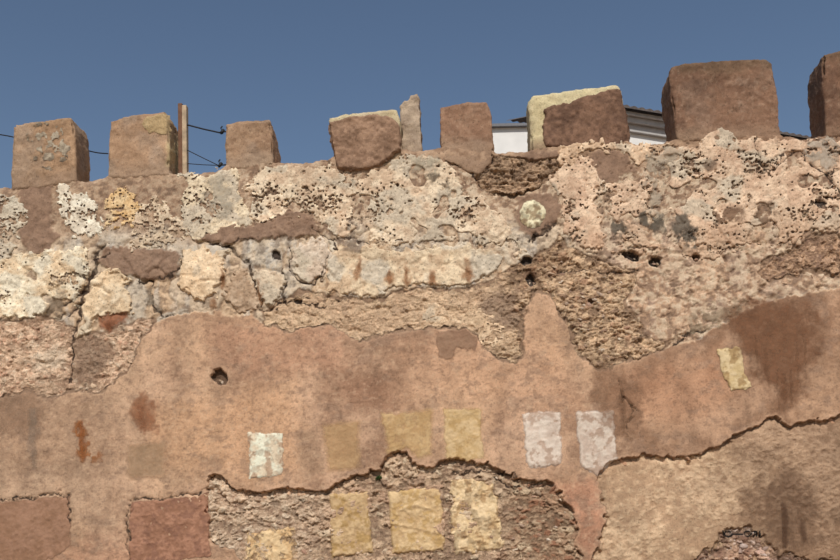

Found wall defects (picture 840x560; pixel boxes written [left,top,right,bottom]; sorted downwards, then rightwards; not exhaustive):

crack [61,243,110,383]
crack [207,228,377,312]
spalling [0,127,840,398]
leakage [727,298,821,401]
corrosion [74,421,99,461]
spalling [204,453,583,560]
spalling [593,414,840,560]